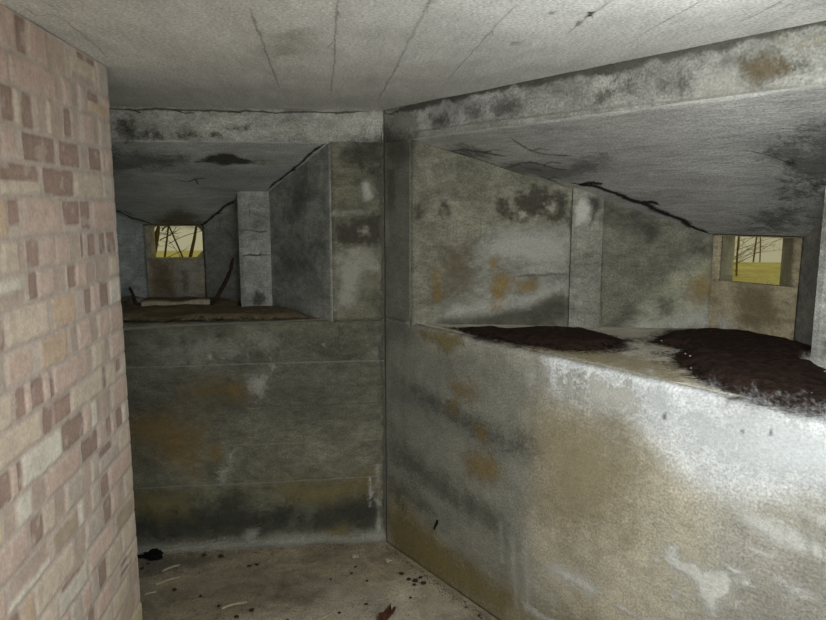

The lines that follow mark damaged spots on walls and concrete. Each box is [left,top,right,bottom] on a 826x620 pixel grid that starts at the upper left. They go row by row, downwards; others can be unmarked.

crack [109,20,826,533]
water stain [742,55,790,85]